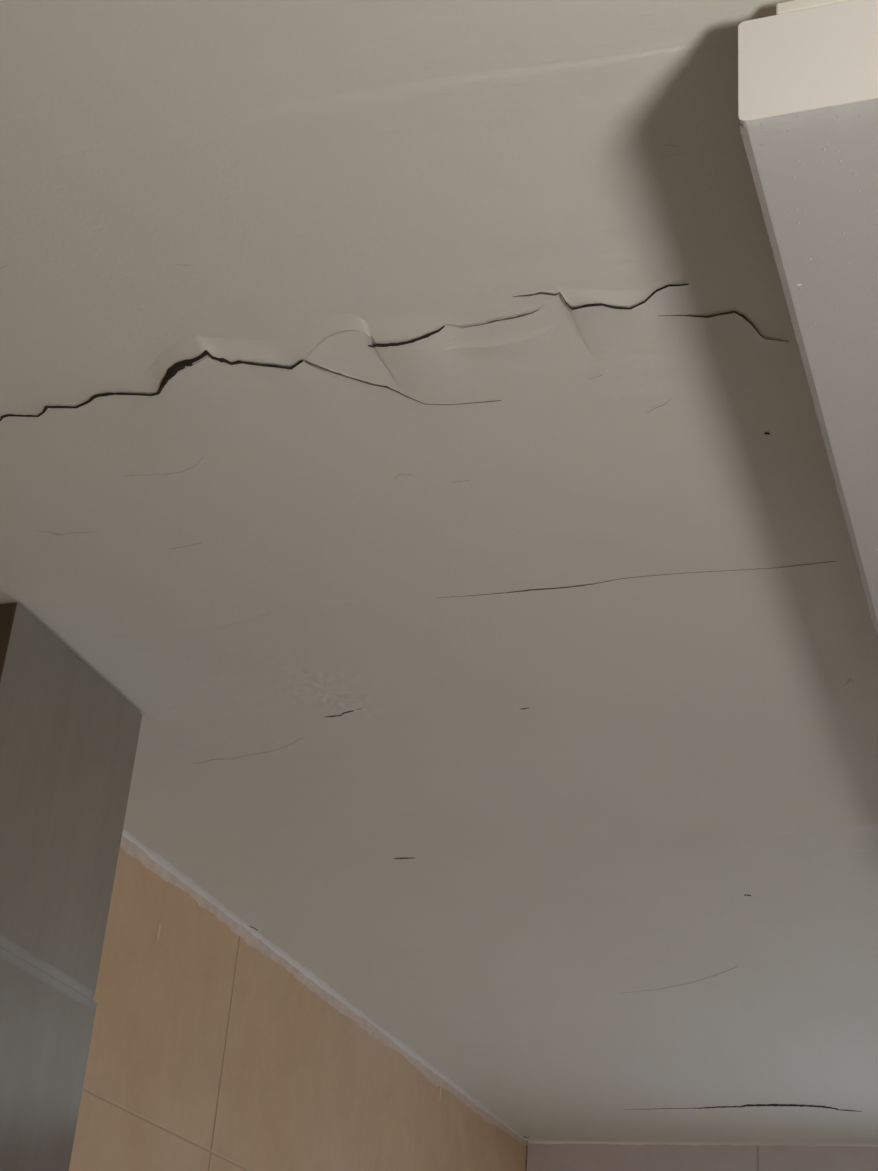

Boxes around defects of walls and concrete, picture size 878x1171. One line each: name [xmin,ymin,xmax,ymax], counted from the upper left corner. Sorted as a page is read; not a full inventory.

crack [436,560,837,598]
crack [623,1104,862,1112]